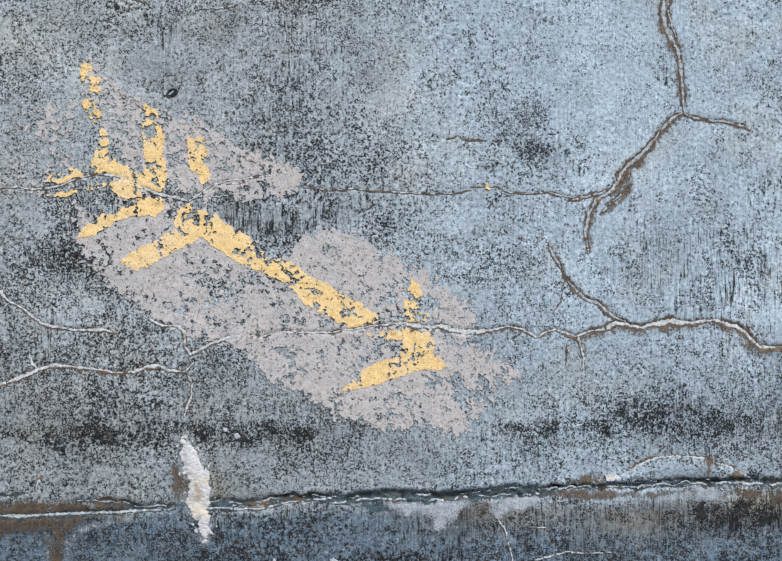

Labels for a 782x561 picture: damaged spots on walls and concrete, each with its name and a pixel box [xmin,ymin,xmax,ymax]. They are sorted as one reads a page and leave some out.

crack [0,0,751,255]
peeling [8,53,523,438]
crack [0,241,782,417]
corrosion [0,498,132,561]
crack [0,469,177,523]
water stain [0,413,319,546]
water stain [335,546,453,561]
water stain [388,497,471,531]
crack [206,474,782,561]